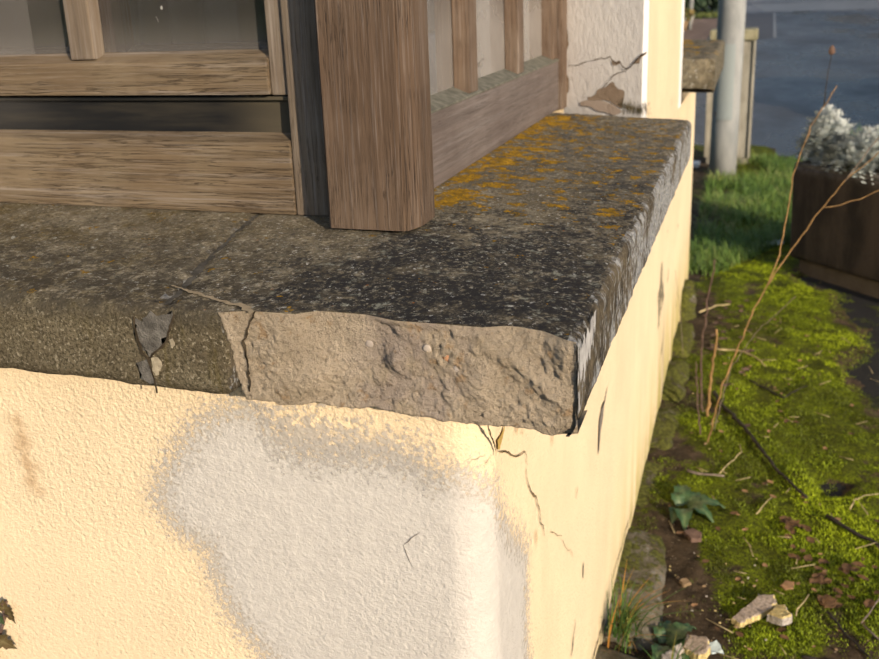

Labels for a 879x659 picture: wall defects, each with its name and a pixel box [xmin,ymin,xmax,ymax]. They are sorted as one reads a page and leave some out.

peeling [580,82,625,115]
crack [569,52,647,89]
crack [132,314,175,393]
spalling [151,357,163,376]
crack [171,285,256,392]
crack [484,425,573,554]